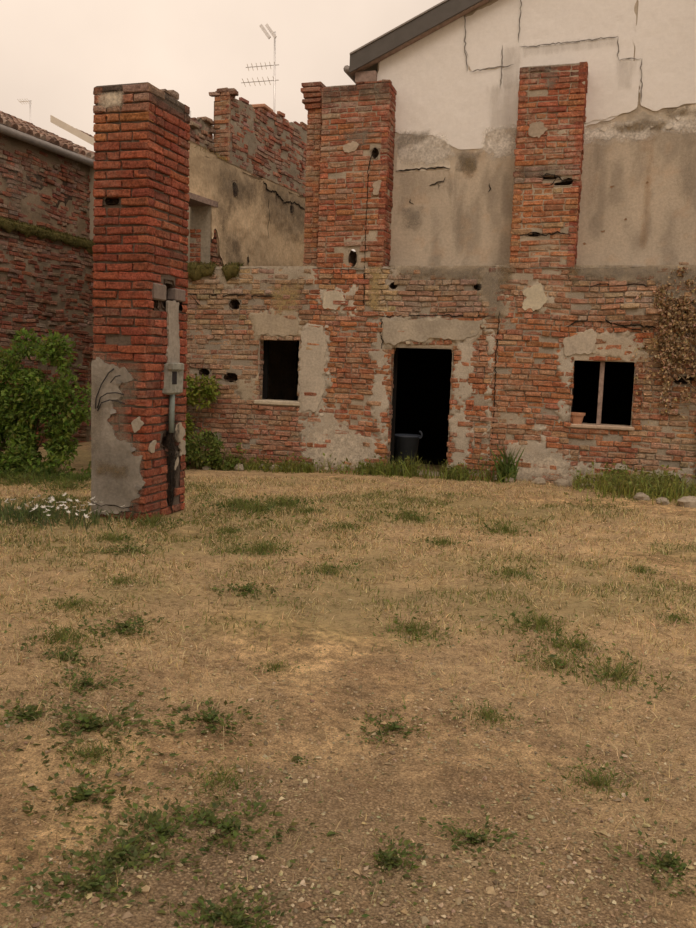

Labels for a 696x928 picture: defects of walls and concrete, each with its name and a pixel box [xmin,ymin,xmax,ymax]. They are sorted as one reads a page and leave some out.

leakage [398,127,516,172]
leakage [583,108,696,143]
crack [263,181,305,236]
crack [362,149,500,444]
flaking render [522,283,548,311]
flaking render [252,313,330,416]
flaking render [563,332,608,357]
flaking render [90,357,146,515]